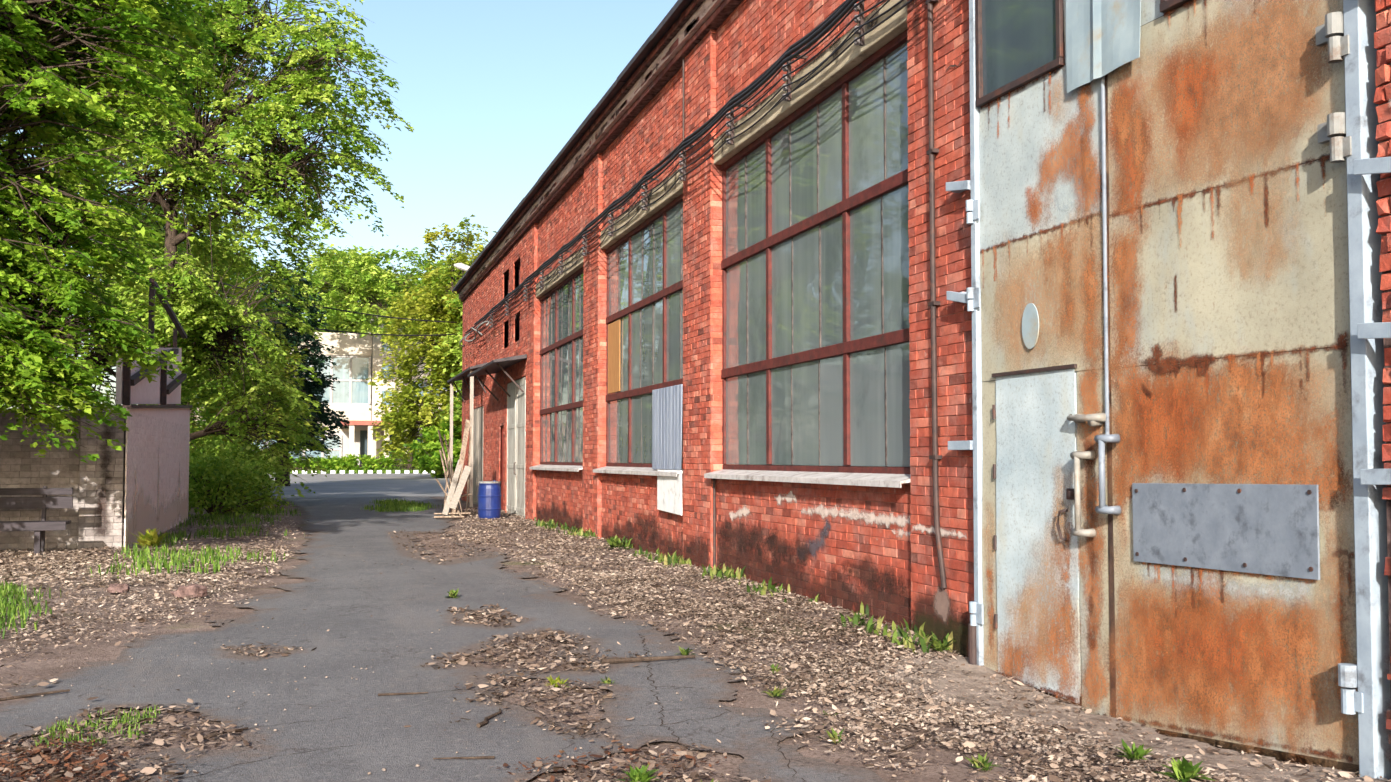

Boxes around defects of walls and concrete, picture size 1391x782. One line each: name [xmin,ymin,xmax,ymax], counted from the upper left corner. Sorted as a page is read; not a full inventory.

damp [776,491,964,538]
damp [601,507,970,654]
crack [770,729,838,782]